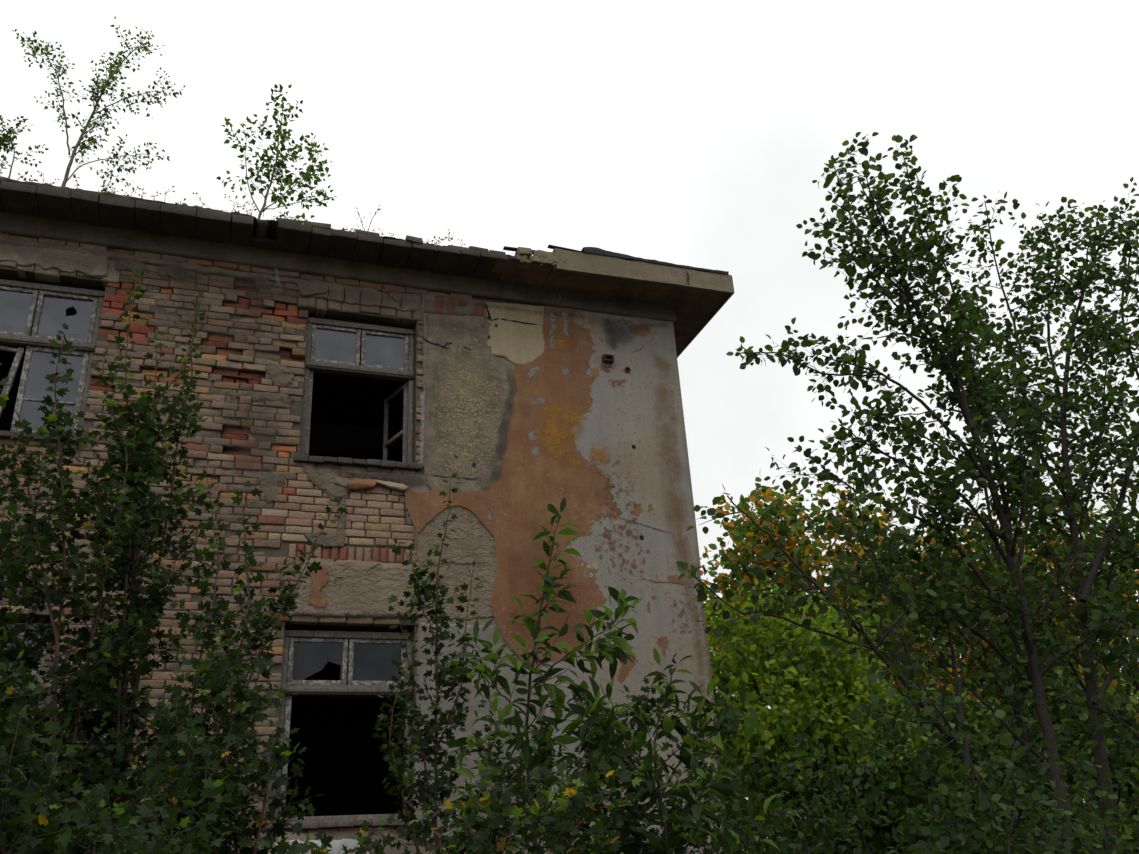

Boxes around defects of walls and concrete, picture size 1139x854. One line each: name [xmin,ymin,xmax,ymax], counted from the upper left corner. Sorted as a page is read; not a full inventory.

spalling [0,181,529,281]
peeling [262,294,652,847]